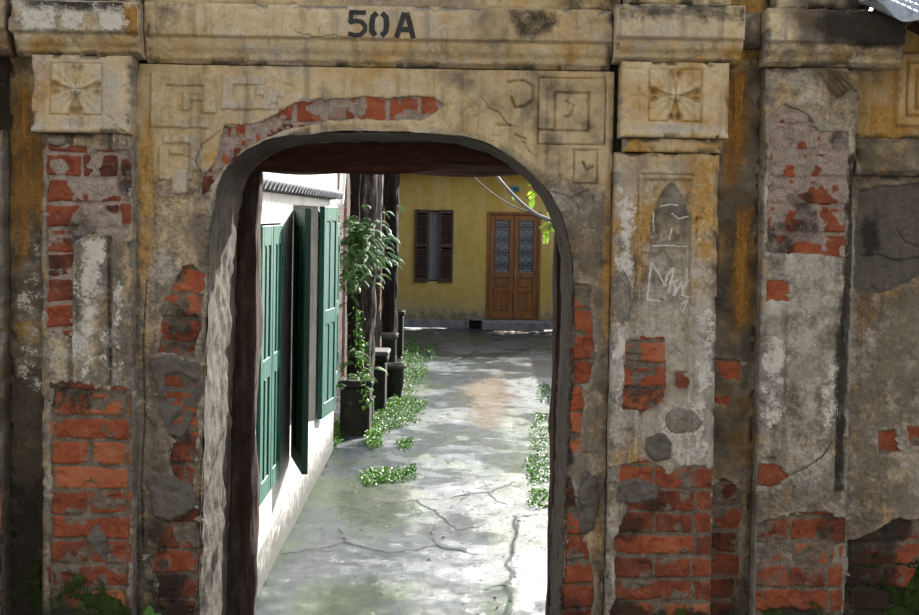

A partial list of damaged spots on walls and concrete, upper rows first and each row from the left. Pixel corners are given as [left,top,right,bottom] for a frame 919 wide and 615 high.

flaking render [42,143,132,339]
flaking render [199,94,444,195]
flaking render [763,105,853,260]
flaking render [157,265,206,361]
flaking render [567,281,599,453]
flaking render [618,336,694,414]
leakage [0,477,74,615]
flaking render [44,374,204,615]
crack [283,481,537,615]
flaking render [559,477,594,615]
flaking render [610,458,743,615]
flaking render [755,511,919,615]